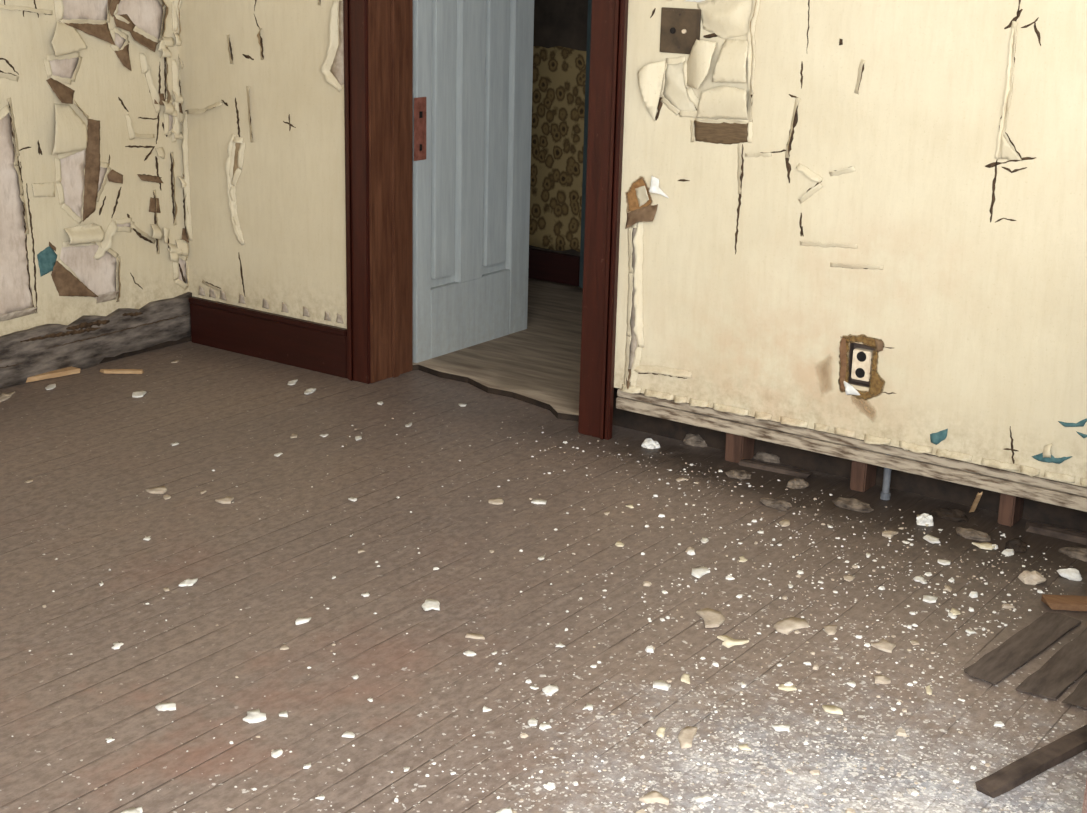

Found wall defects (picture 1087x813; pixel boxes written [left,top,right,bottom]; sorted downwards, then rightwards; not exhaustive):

peeling [0,0,254,322]
peeling [227,0,264,64]
peeling [638,0,761,145]
crack [735,0,883,270]
crack [985,0,1041,222]
peeling [621,176,1087,486]